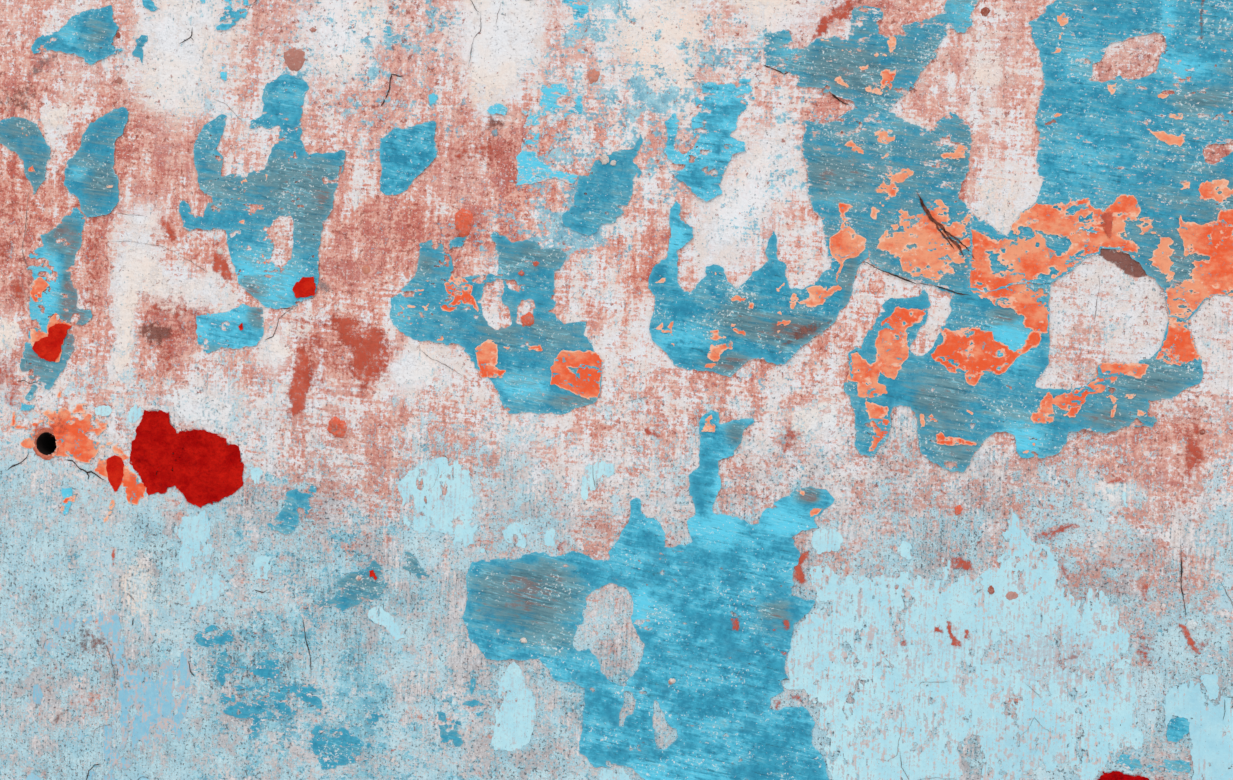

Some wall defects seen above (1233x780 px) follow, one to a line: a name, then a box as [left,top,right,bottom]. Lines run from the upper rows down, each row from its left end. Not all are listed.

peeling [0,74,346,607]
peeling [390,232,604,415]
peeling [648,0,1233,473]
crack [917,193,974,258]
peeling [396,410,1233,780]